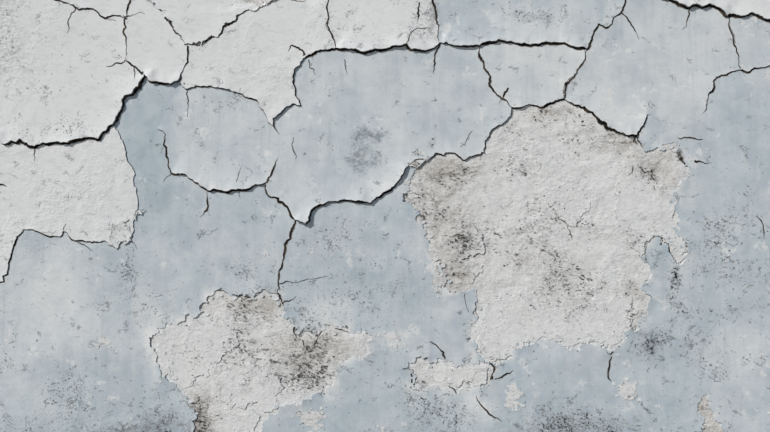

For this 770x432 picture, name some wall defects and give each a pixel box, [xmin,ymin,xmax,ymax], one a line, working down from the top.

crack [663,0,770,111]
peeling [0,0,511,282]
crack [0,0,655,305]
flaking render [404,0,770,394]
crack [677,137,708,164]
flaking render [151,288,406,432]
peeling [504,382,525,411]
flaking render [697,395,723,432]